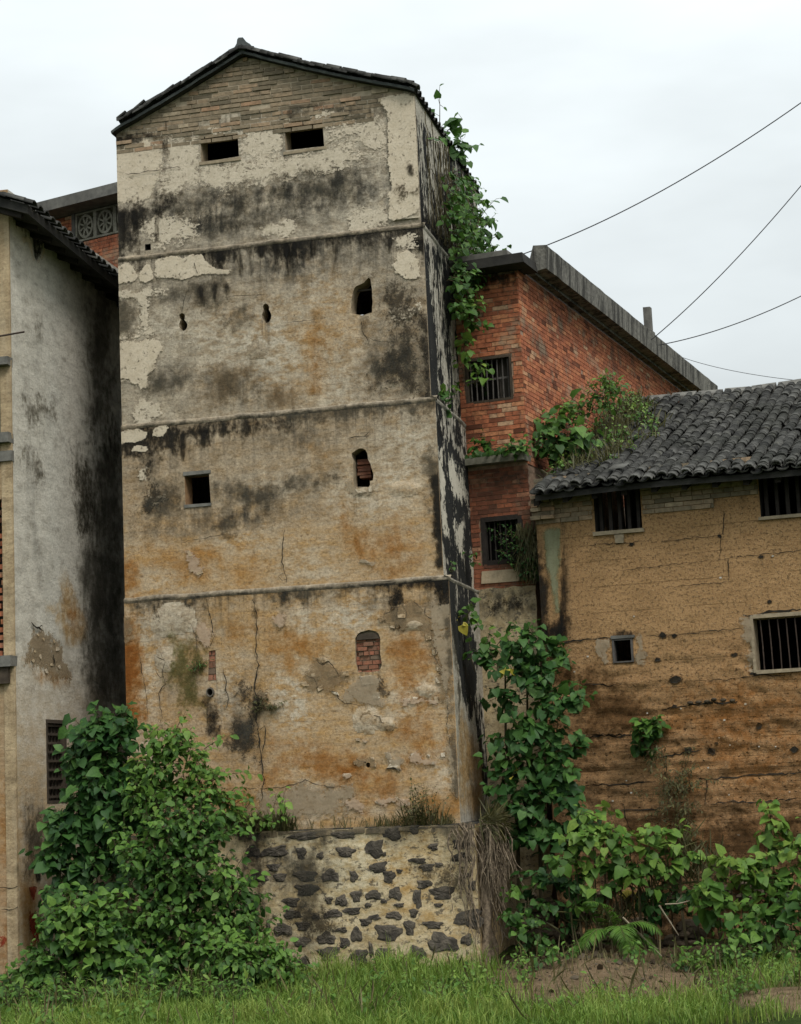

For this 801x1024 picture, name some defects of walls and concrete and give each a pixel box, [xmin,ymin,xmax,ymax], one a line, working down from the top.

damp [118,208,145,257]
damp [197,249,236,263]
peeling [116,93,423,452]
damp [258,237,309,260]
damp [122,421,227,456]
damp [384,115,488,801]
crack [227,600,345,801]
flaking render [332,675,386,718]
crack [662,674,783,710]
crack [576,733,632,741]
crack [699,772,801,805]